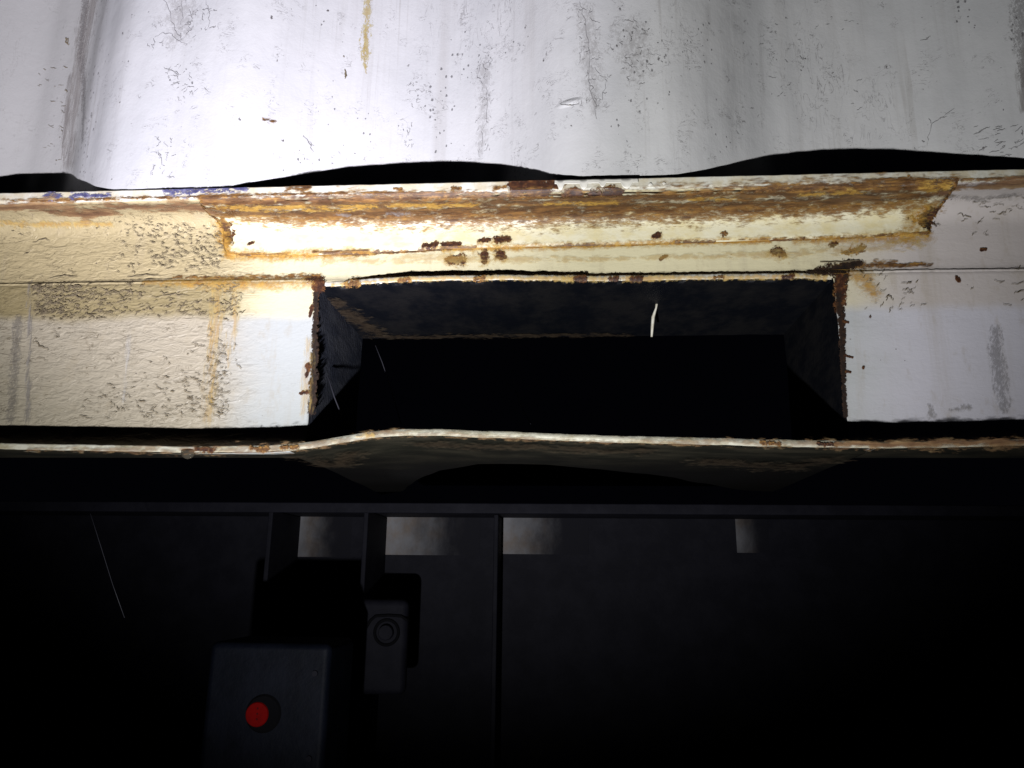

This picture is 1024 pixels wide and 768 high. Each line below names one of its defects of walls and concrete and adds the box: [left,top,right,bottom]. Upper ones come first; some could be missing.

rust [359,0,373,74]
rust [0,173,1024,418]